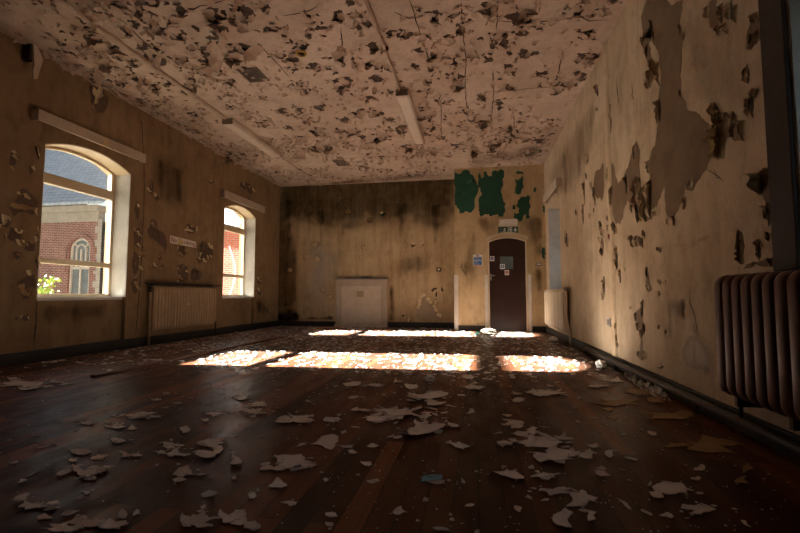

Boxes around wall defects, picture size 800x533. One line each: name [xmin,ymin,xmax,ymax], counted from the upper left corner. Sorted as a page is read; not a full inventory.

peeling [746,12,759,50]
peeling [575,0,757,283]
peeling [733,168,773,269]
peeling [645,267,666,297]